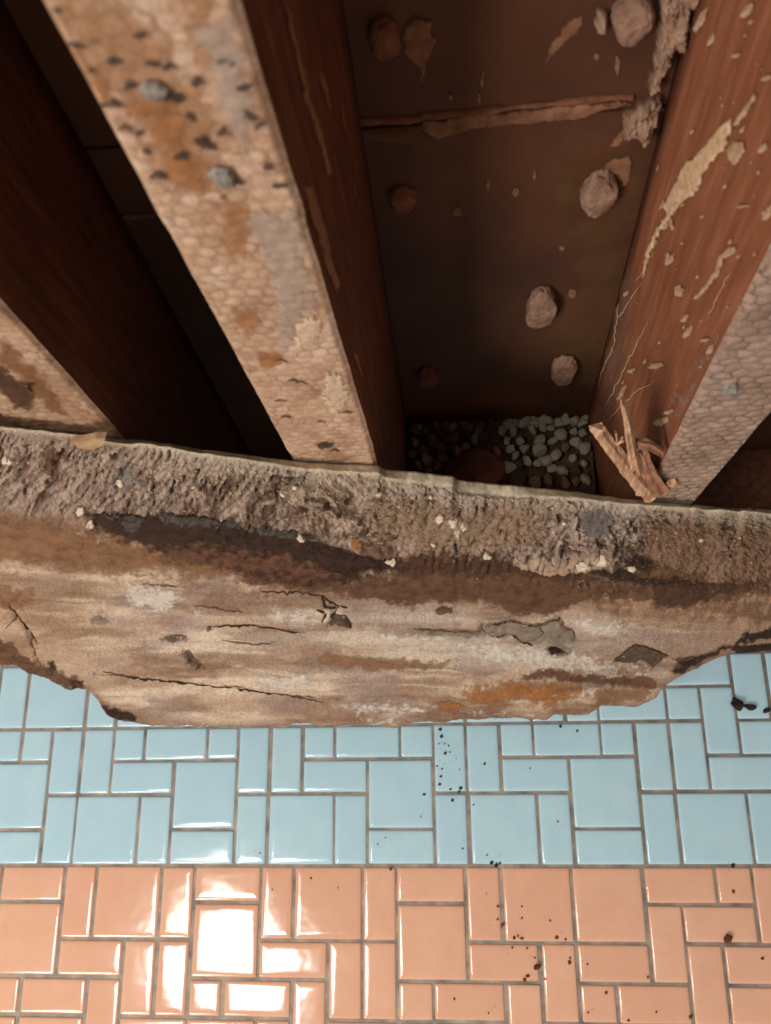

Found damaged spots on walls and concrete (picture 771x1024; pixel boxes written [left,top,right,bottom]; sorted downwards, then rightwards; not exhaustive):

rust [130,101,206,192]
leakage [0,344,66,415]
rust [258,353,281,370]
leakage [0,463,770,637]
spalling [322,490,638,577]
crack [194,606,299,646]
crack [261,591,353,629]
leakage [318,633,647,675]
peeling [413,617,575,655]
spalling [614,645,701,668]
crack [102,671,322,703]
rust [435,668,656,711]